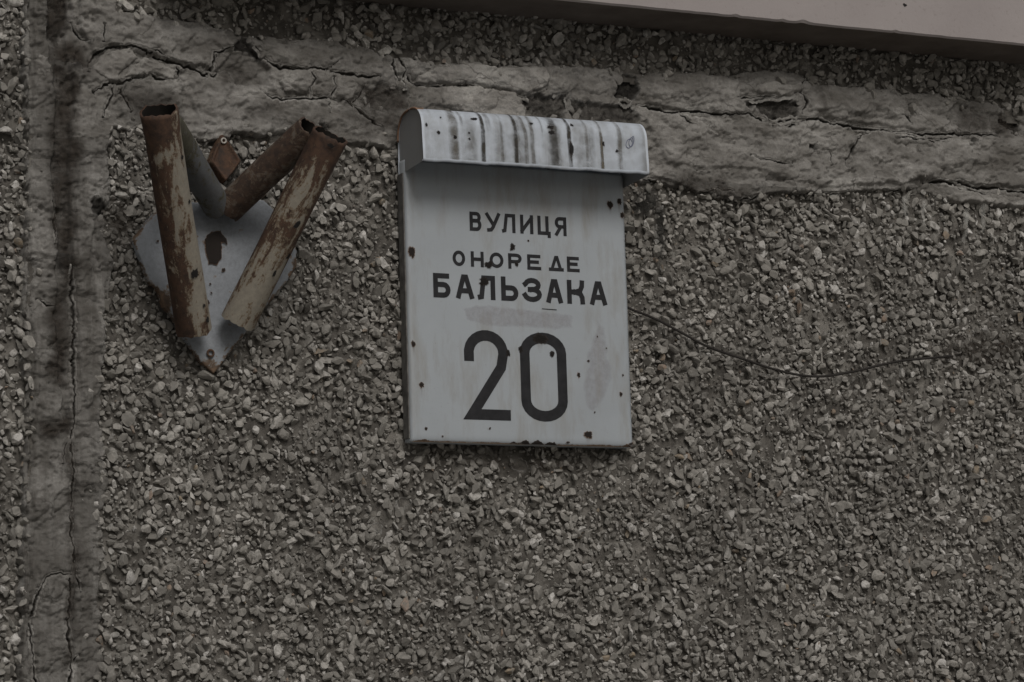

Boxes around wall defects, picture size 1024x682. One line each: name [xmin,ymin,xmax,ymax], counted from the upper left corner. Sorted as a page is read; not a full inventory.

crack [69,23,551,131]
spalling [745,94,803,128]
crack [636,74,1024,197]
crack [640,177,774,205]
rust [204,231,227,272]
crack [27,264,82,682]